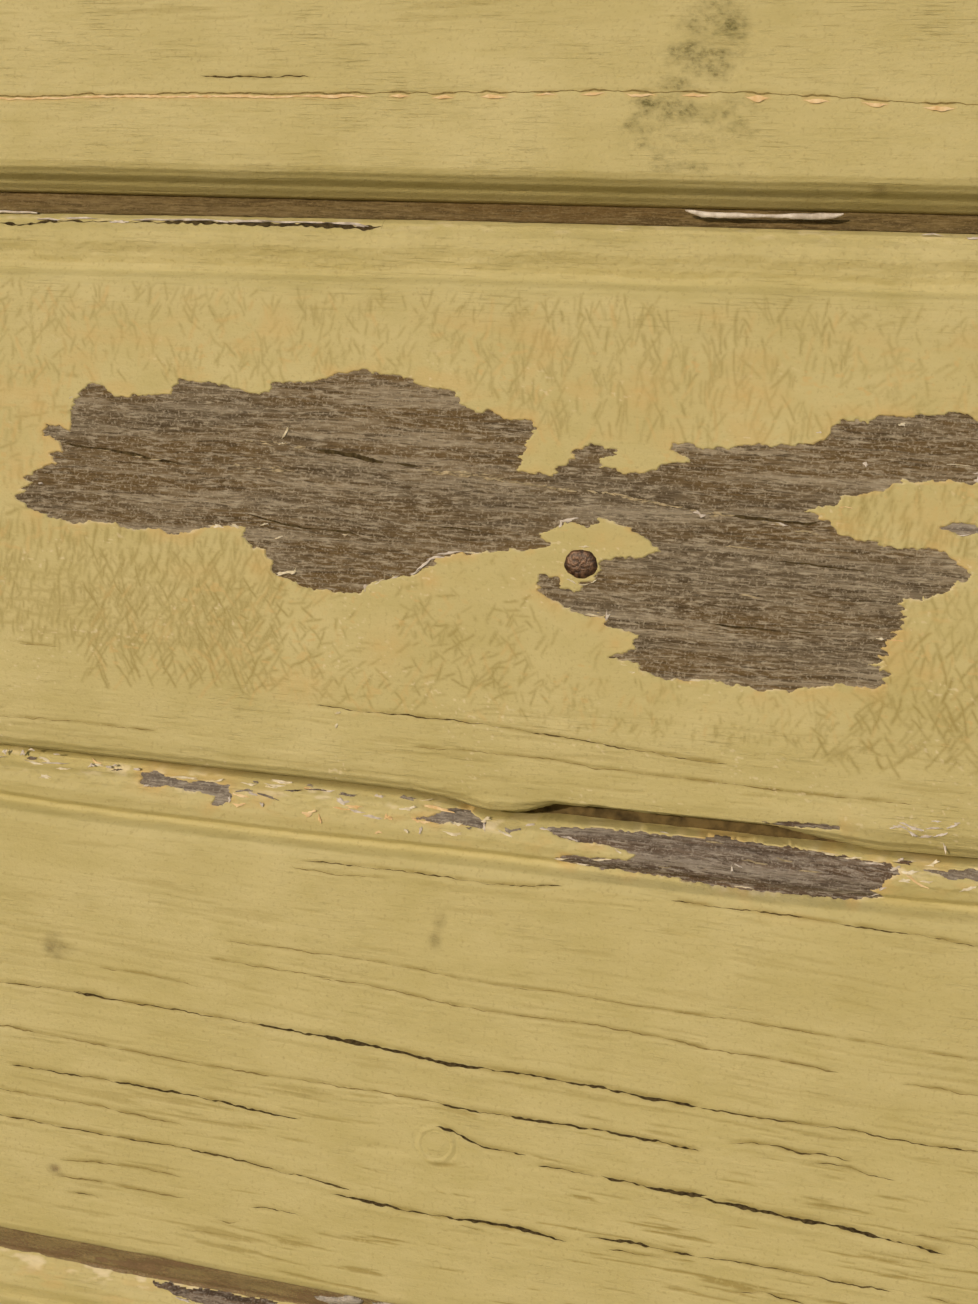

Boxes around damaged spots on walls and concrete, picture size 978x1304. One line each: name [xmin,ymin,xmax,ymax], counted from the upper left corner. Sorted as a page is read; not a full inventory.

crack [0,75,978,111]
peeling [15,369,978,693]
peeling [0,748,71,779]
peeling [88,758,978,900]
crack [0,967,978,1181]
crack [0,1025,977,1304]
peeling [153,1280,278,1304]
peeling [314,1295,391,1304]